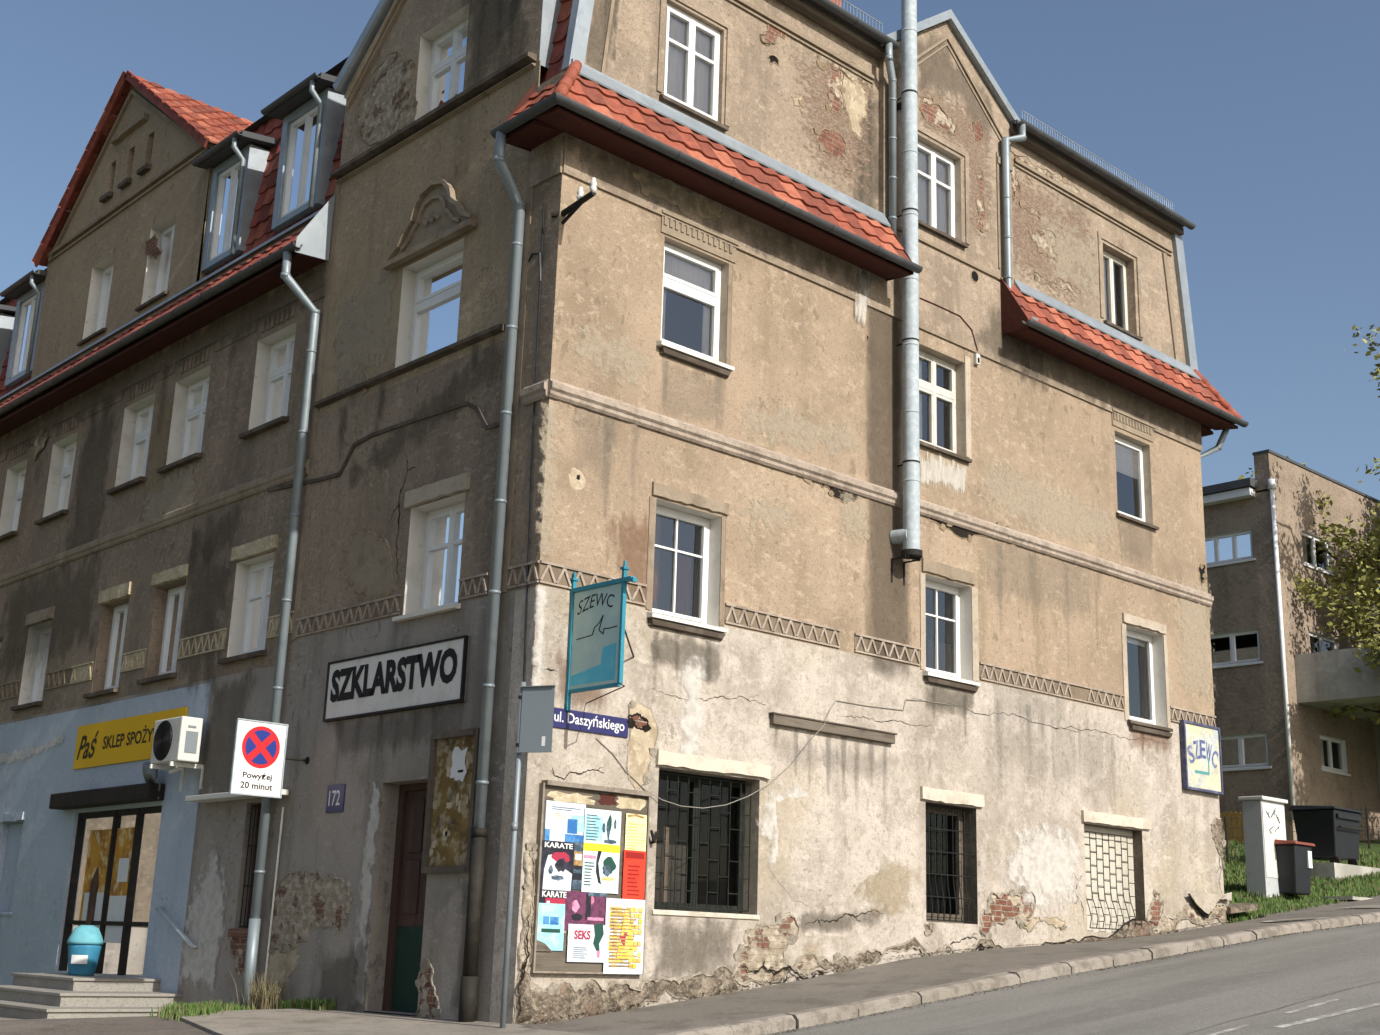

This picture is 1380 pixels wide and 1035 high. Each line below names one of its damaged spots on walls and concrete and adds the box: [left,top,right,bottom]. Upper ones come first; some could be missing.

flaking render [759,20,788,66]
peeling [813,52,873,175]
crack [659,691,765,705]
peeling [626,700,659,790]
crack [806,909,884,926]
flaking render [513,842,1232,1025]
peeling [227,935,299,995]